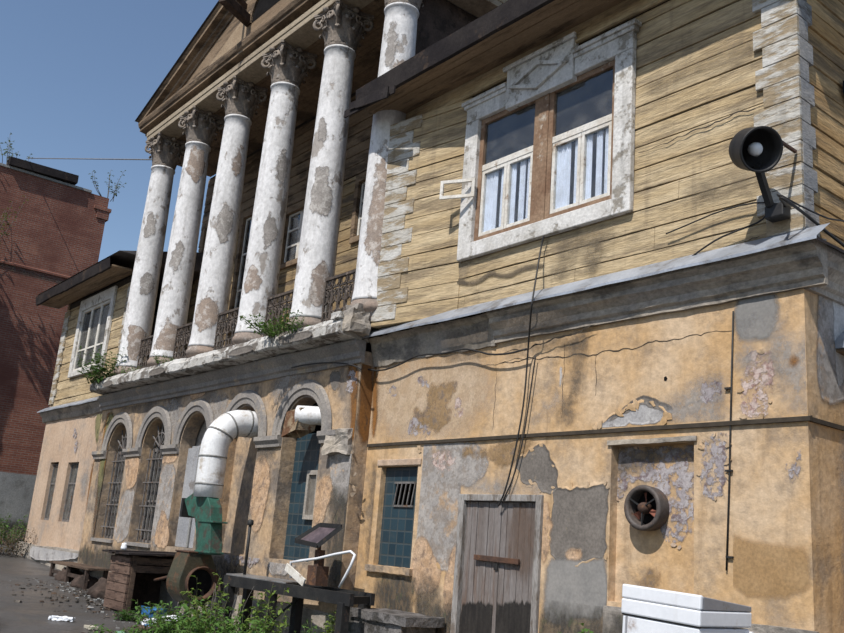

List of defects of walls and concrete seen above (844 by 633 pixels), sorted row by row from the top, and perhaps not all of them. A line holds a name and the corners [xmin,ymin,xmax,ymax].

peeling [318,117,327,142]
crack [639,105,763,153]
peeling [216,204,234,243]
peeling [309,166,333,217]
peeling [364,157,387,265]
peeling [195,297,219,332]
crack [480,325,727,426]
flaking render [737,349,775,419]
flaking render [408,417,464,610]
flaking render [515,433,732,567]